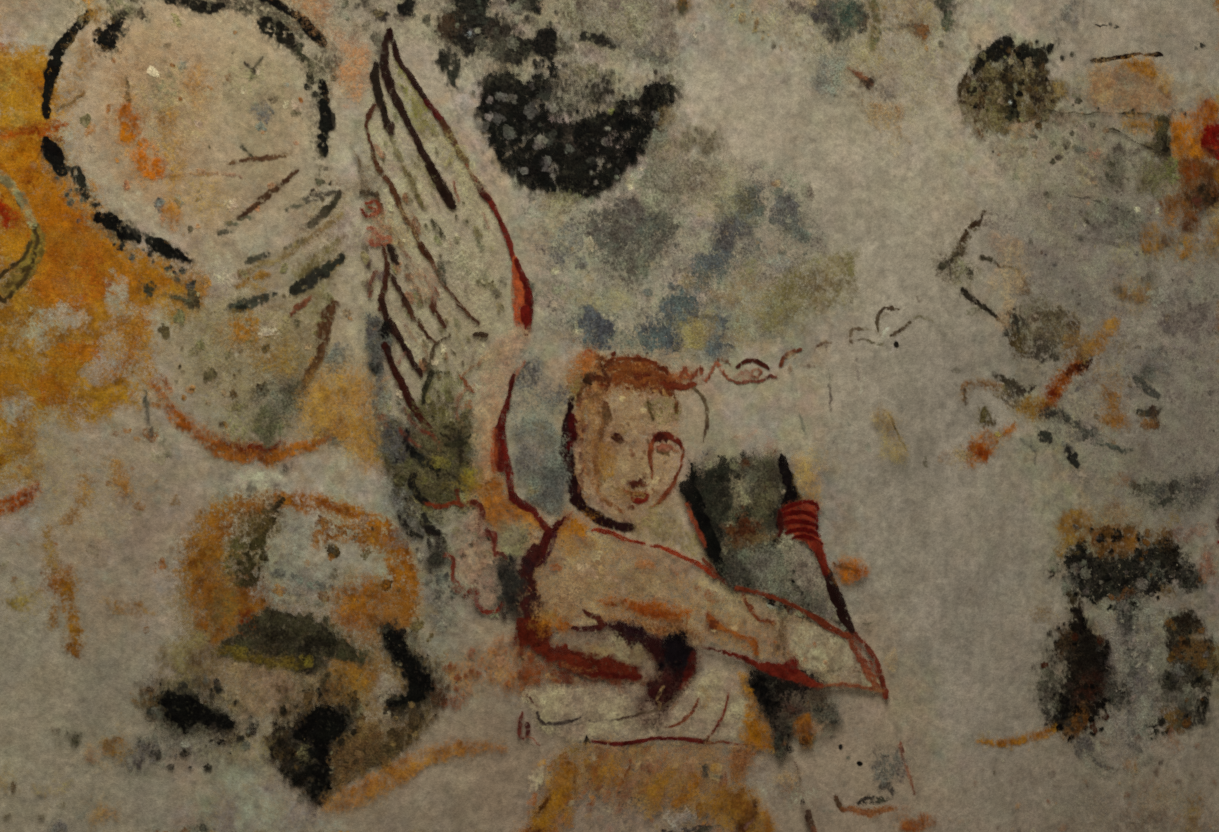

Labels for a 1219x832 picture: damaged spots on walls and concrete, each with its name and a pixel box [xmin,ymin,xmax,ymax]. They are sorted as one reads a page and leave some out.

damp [434,0,725,201]
damp [957,0,1084,138]
damp [0,39,207,514]
damp [1074,58,1219,429]
damp [1021,408,1133,468]
damp [85,607,465,807]
damp [977,470,1219,832]